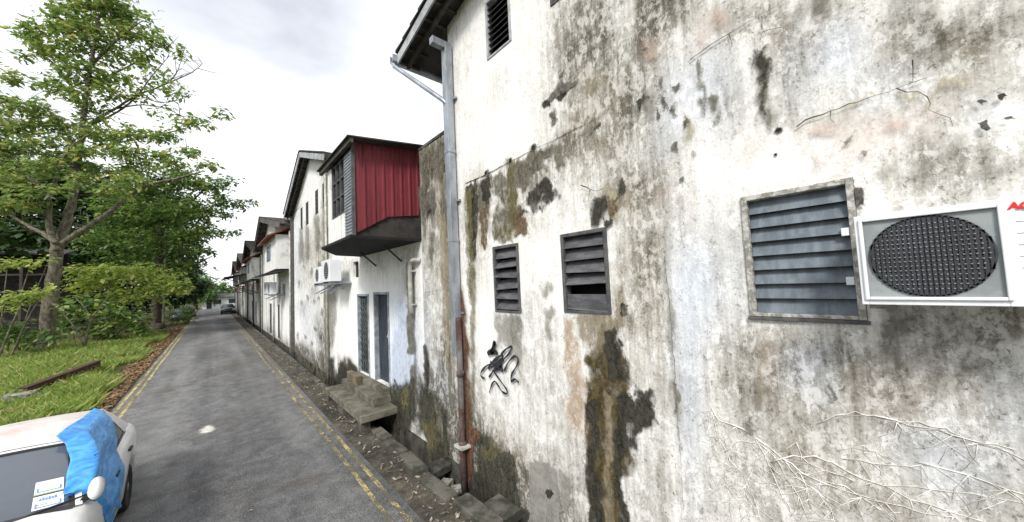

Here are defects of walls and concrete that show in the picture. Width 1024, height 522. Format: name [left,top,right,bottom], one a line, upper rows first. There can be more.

crack [689,1,802,60]
water stain [749,45,773,130]
crack [796,60,953,127]
water stain [419,136,447,267]
water stain [590,178,626,228]
water stain [464,133,570,423]
rust [439,214,481,487]
water stain [577,287,657,522]